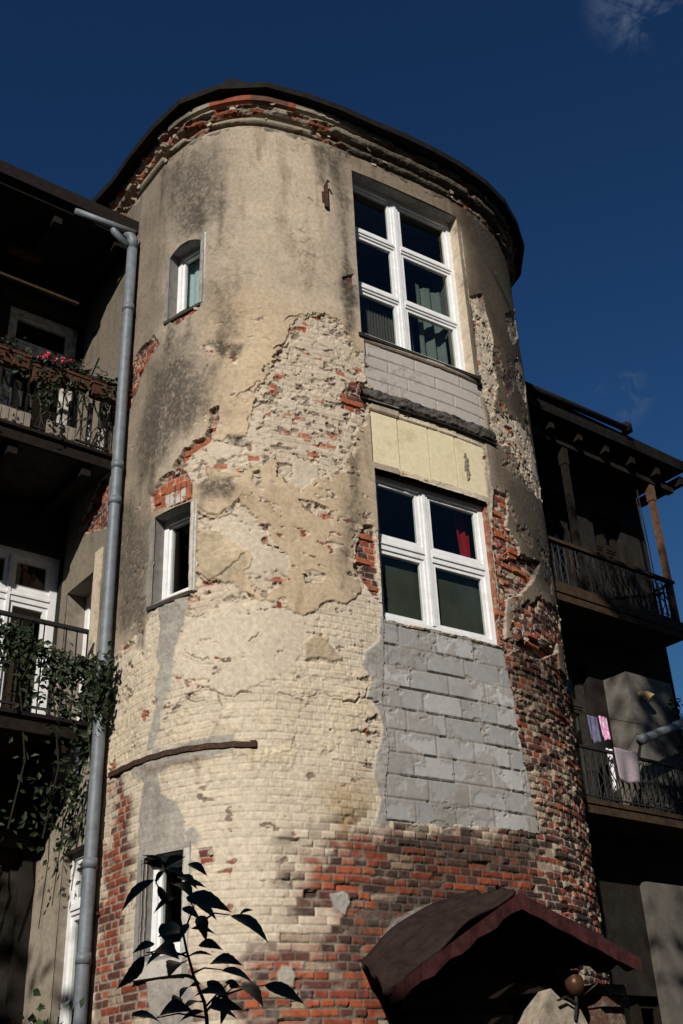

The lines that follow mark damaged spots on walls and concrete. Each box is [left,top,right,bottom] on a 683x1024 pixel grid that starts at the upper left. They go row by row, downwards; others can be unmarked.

leakage [214,288,241,355]
leakage [344,263,354,326]
spalling [127,334,160,411]
leakage [138,343,206,493]
peeling [469,293,543,505]
peeling [150,312,373,619]
spalling [350,523,381,599]
spalling [491,489,562,660]
spalling [197,846,215,866]